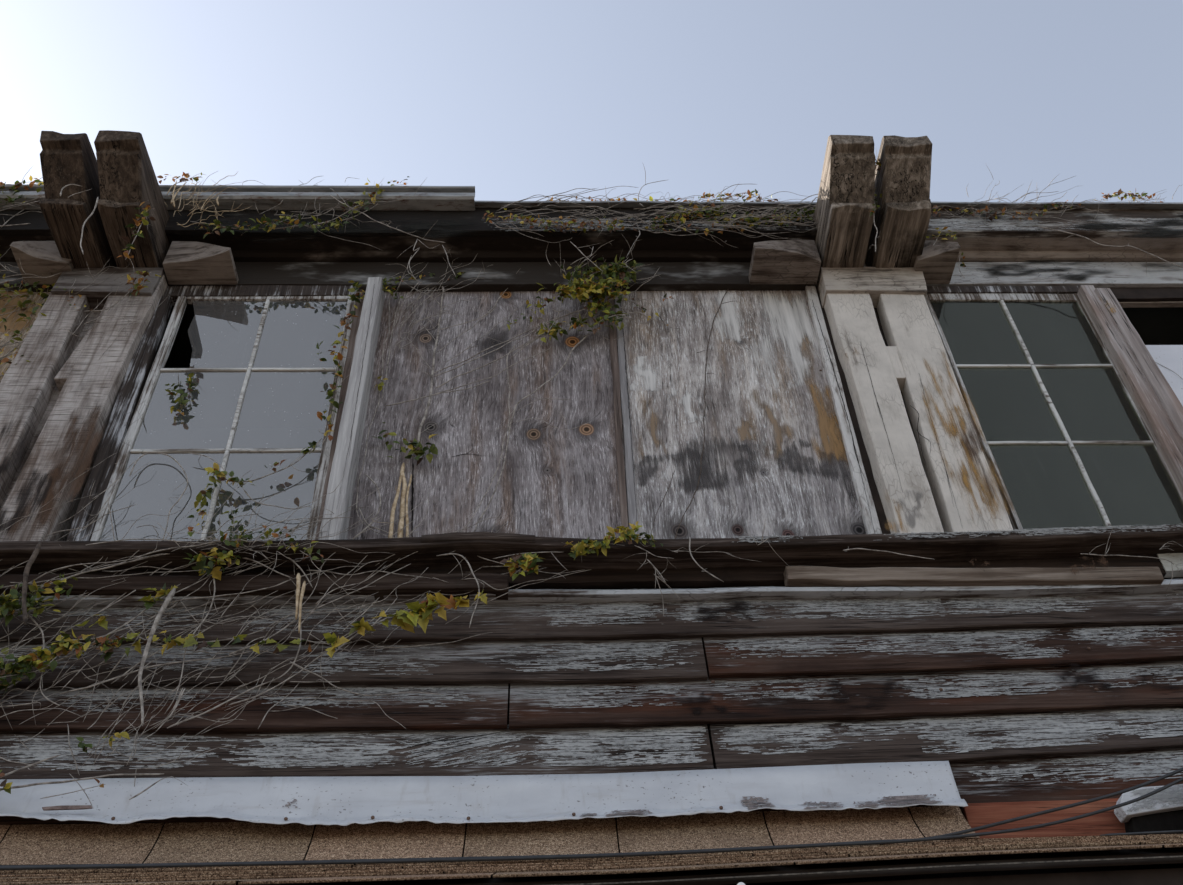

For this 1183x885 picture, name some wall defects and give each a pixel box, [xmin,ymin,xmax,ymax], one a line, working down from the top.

damp [800,324,813,353]
damp [630,356,756,493]
damp [753,390,853,501]
peeling [236,604,403,634]
peeling [530,596,1096,626]
peeling [60,688,221,712]
peeling [111,646,235,671]
peeling [240,645,498,708]
peeling [487,640,698,672]
peeling [517,677,860,708]
peeling [709,625,1183,698]
peeling [0,708,1183,812]